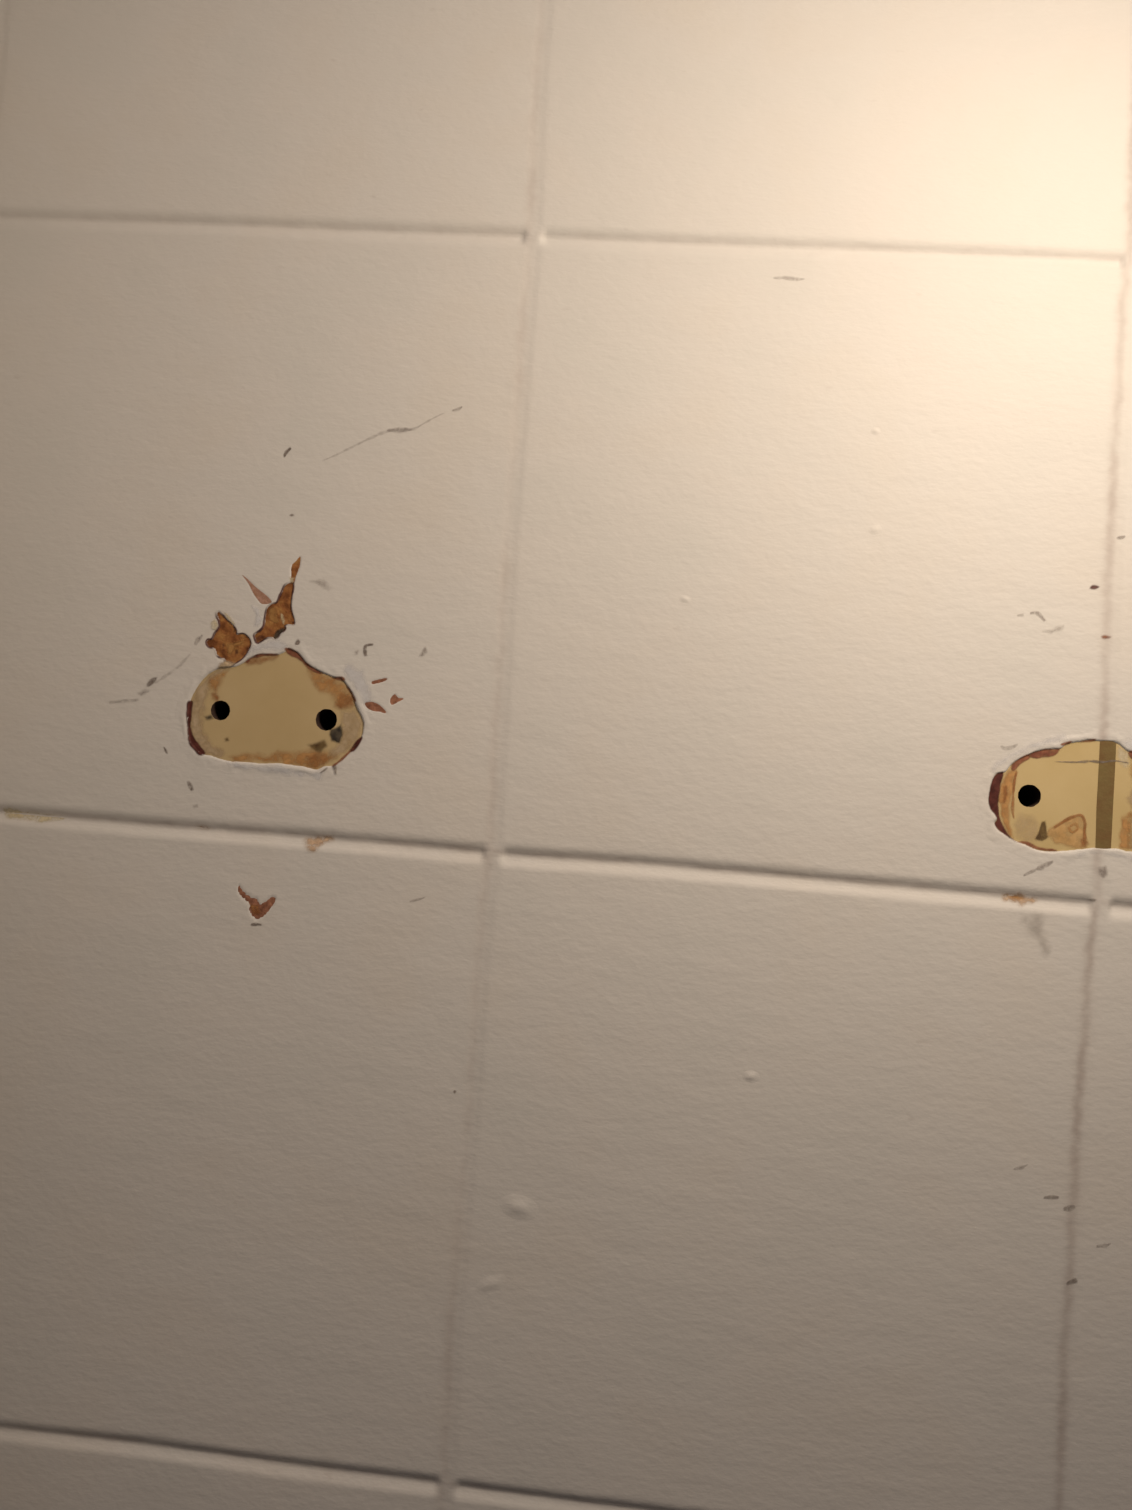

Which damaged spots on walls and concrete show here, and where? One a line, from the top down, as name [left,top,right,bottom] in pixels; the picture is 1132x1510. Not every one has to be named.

peeling [175,557,403,782]
peeling [975,727,1132,865]
peeling [238,886,276,926]